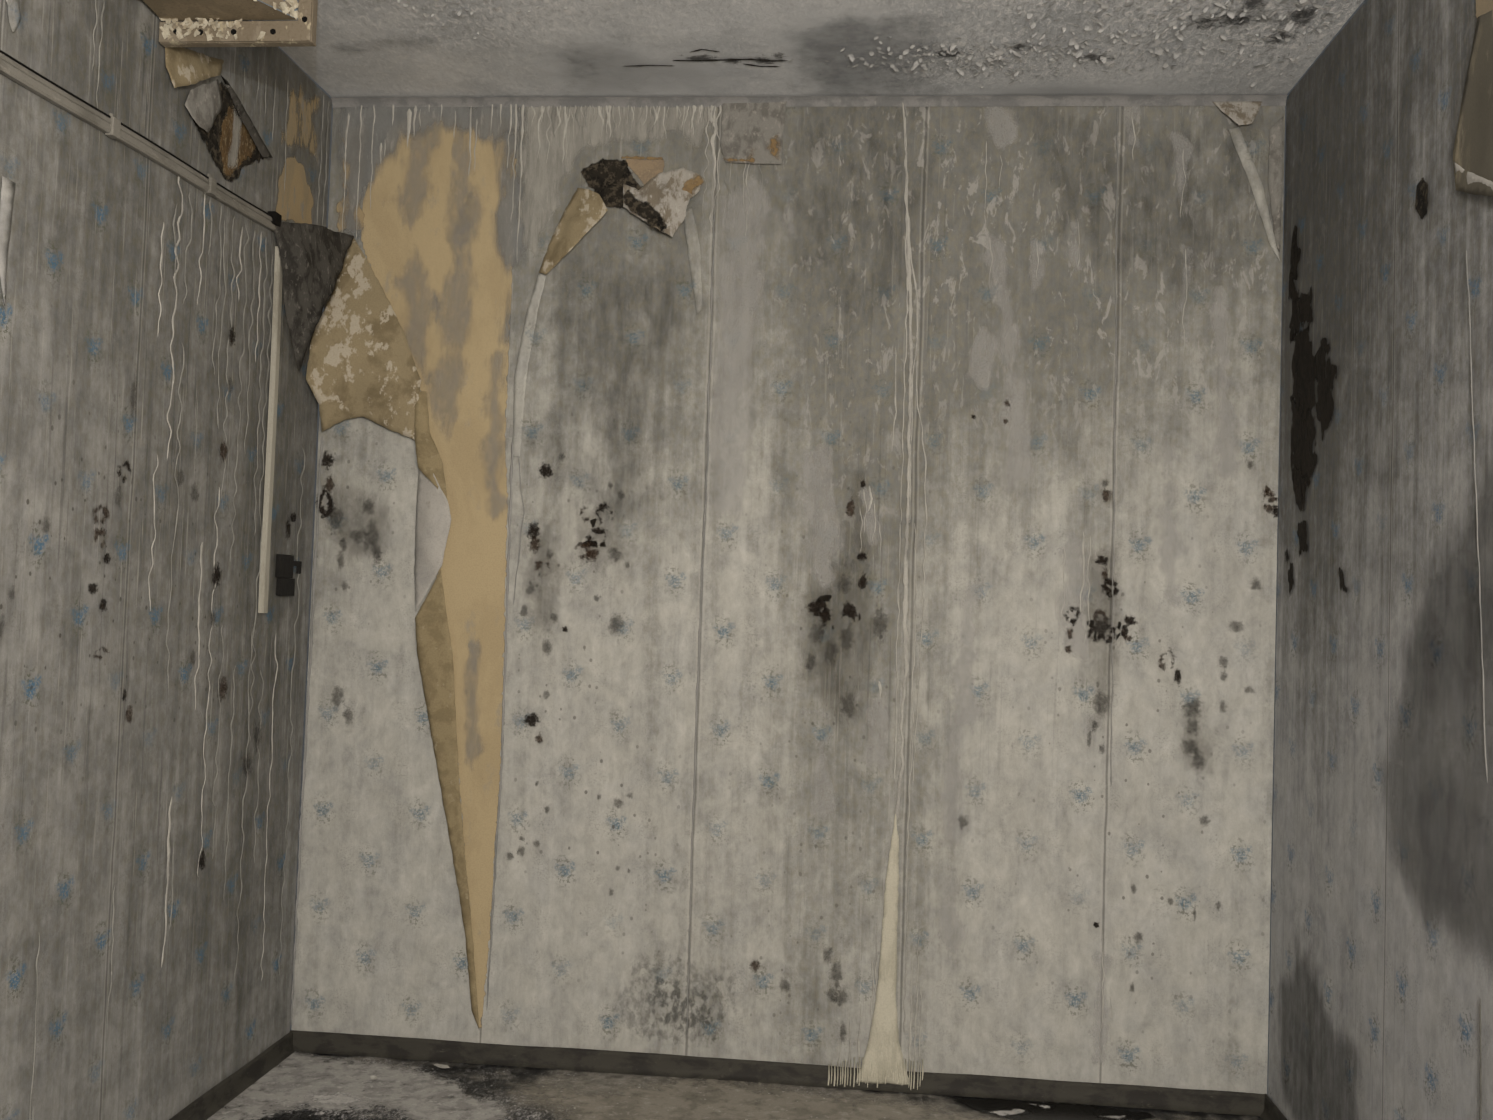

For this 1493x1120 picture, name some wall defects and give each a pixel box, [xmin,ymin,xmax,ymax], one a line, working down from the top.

peeling [1476,0,1493,18]
peeling [0,176,16,305]
spalling [189,81,267,182]
flaking render [276,156,314,224]
spalling [581,158,665,209]
water stain [1264,226,1337,594]
peeling [336,107,524,1028]
water stain [577,485,623,559]
water stain [808,481,881,655]
water stain [828,102,928,1090]
water stain [1061,532,1136,653]
water stain [524,713,542,742]